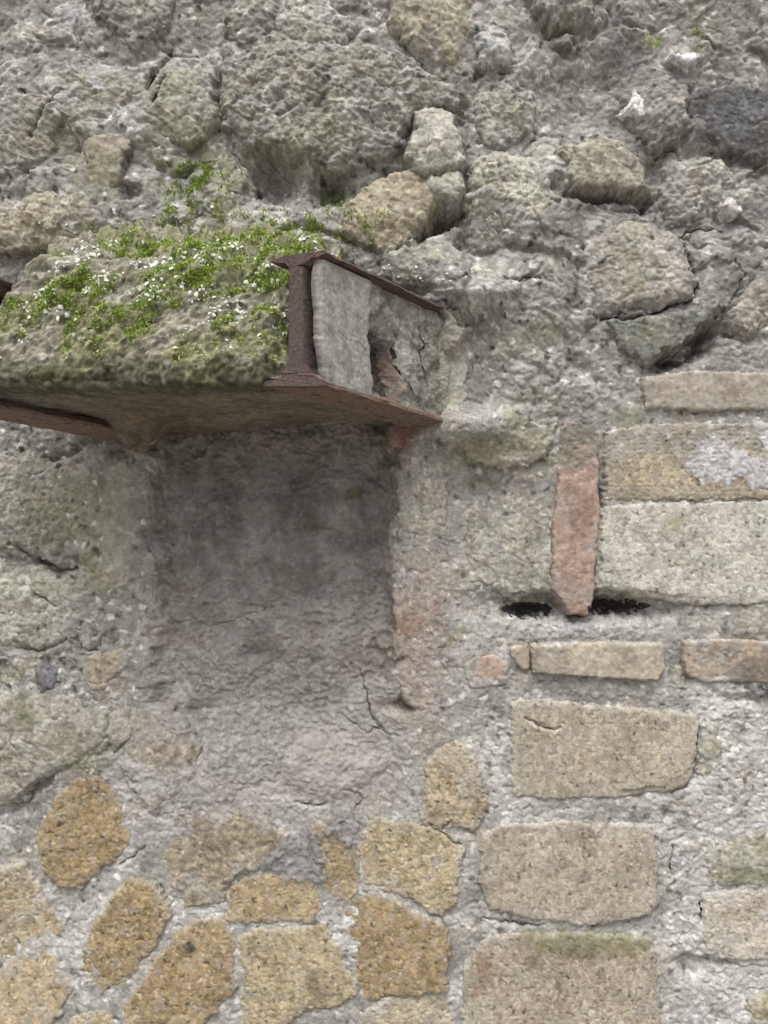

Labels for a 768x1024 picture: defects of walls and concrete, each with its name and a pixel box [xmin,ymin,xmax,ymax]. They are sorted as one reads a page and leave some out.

crack [389,326,428,395]
crack [346,669,396,736]